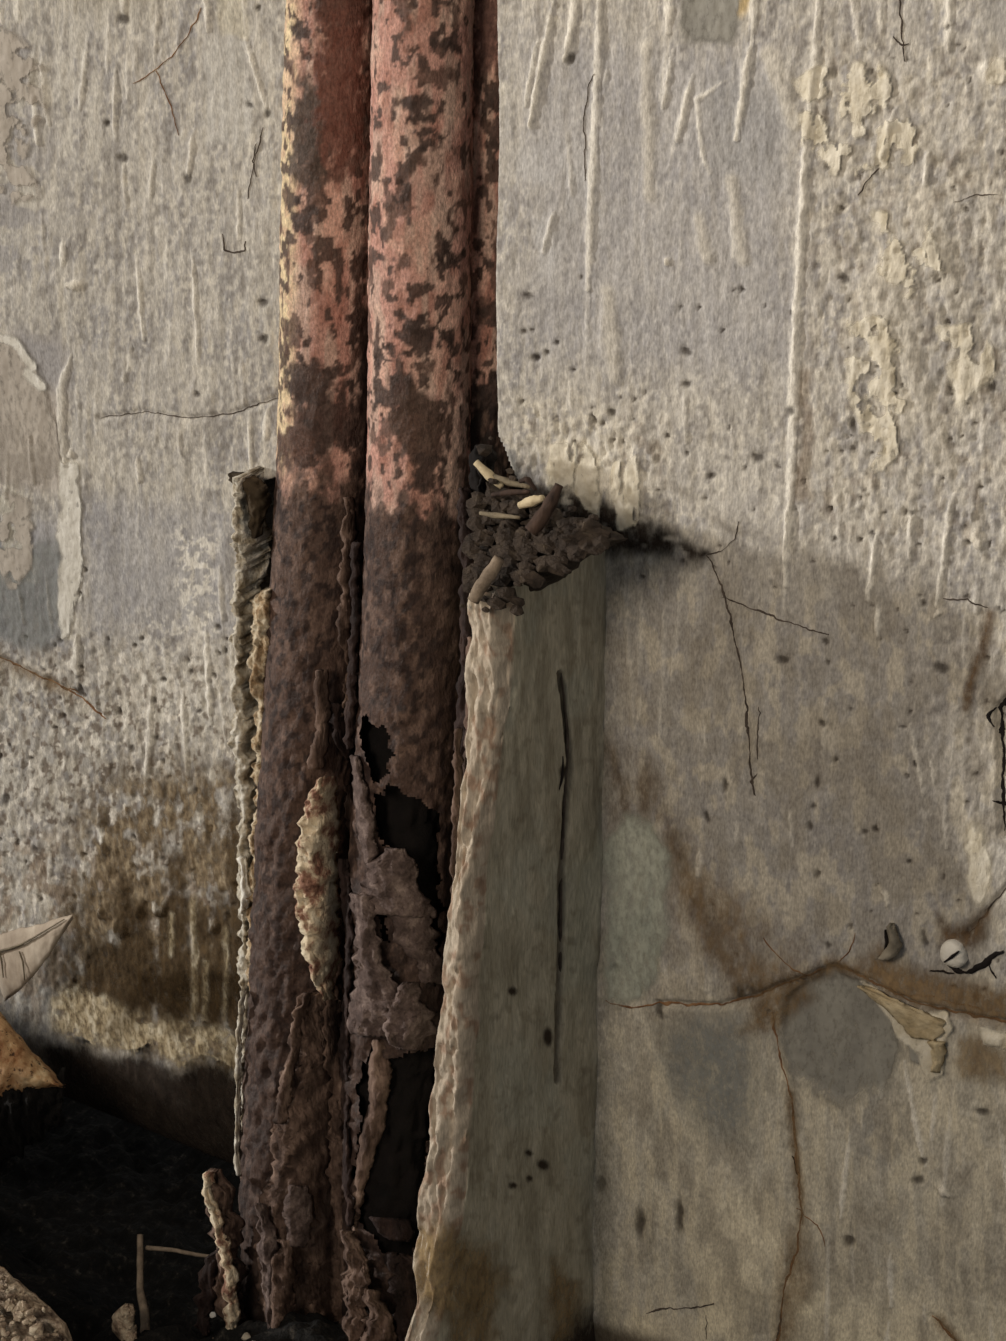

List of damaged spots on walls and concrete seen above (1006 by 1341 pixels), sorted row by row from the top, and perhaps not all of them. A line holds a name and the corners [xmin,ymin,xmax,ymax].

crack [105,398,276,418]
peeling [0,334,83,639]
peeling [546,443,640,531]
crack [0,657,106,719]
crack [706,521,829,796]
crack [943,598,988,608]
crack [986,698,1006,831]
leakage [51,768,243,1073]
corrosion [193,444,503,1341]
crack [971,888,1006,931]
spalling [780,968,1006,1104]
crack [605,934,1006,1341]